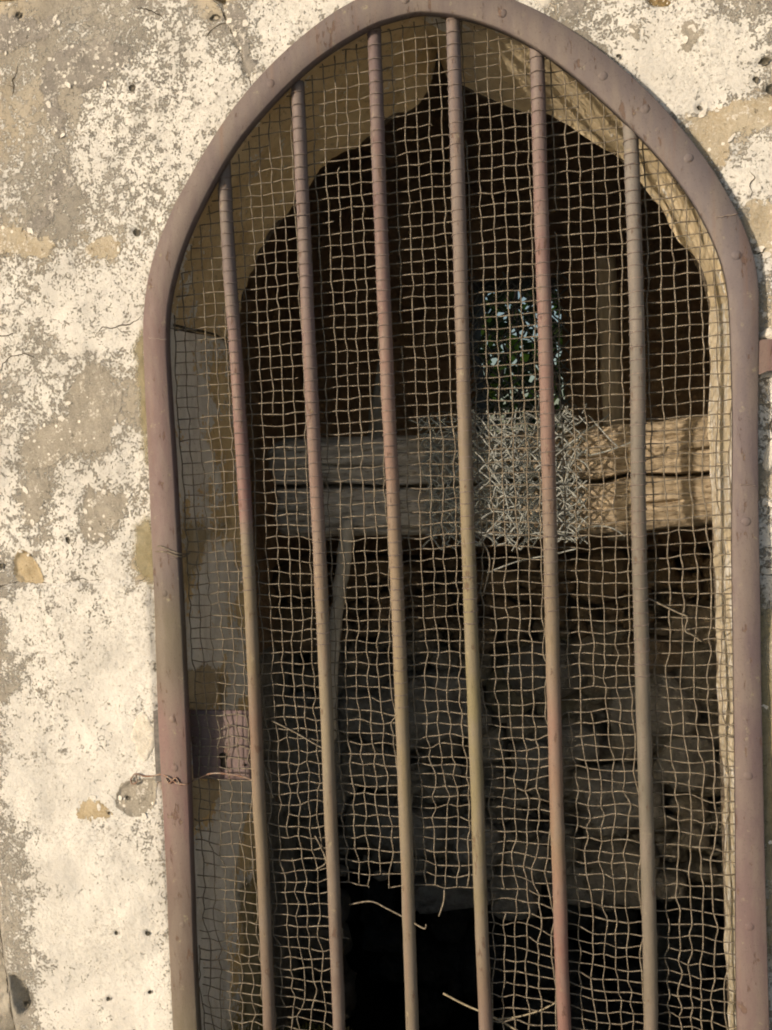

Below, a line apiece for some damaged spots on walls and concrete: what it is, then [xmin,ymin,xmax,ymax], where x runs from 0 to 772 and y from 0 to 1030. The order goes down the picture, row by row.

peeling [677,19,704,52]
peeling [685,57,772,170]
peeling [0,168,77,258]
peeling [82,235,122,263]
peeling [744,198,772,259]
spalling [0,549,44,584]
peeling [763,606,772,675]
spalling [76,778,157,822]